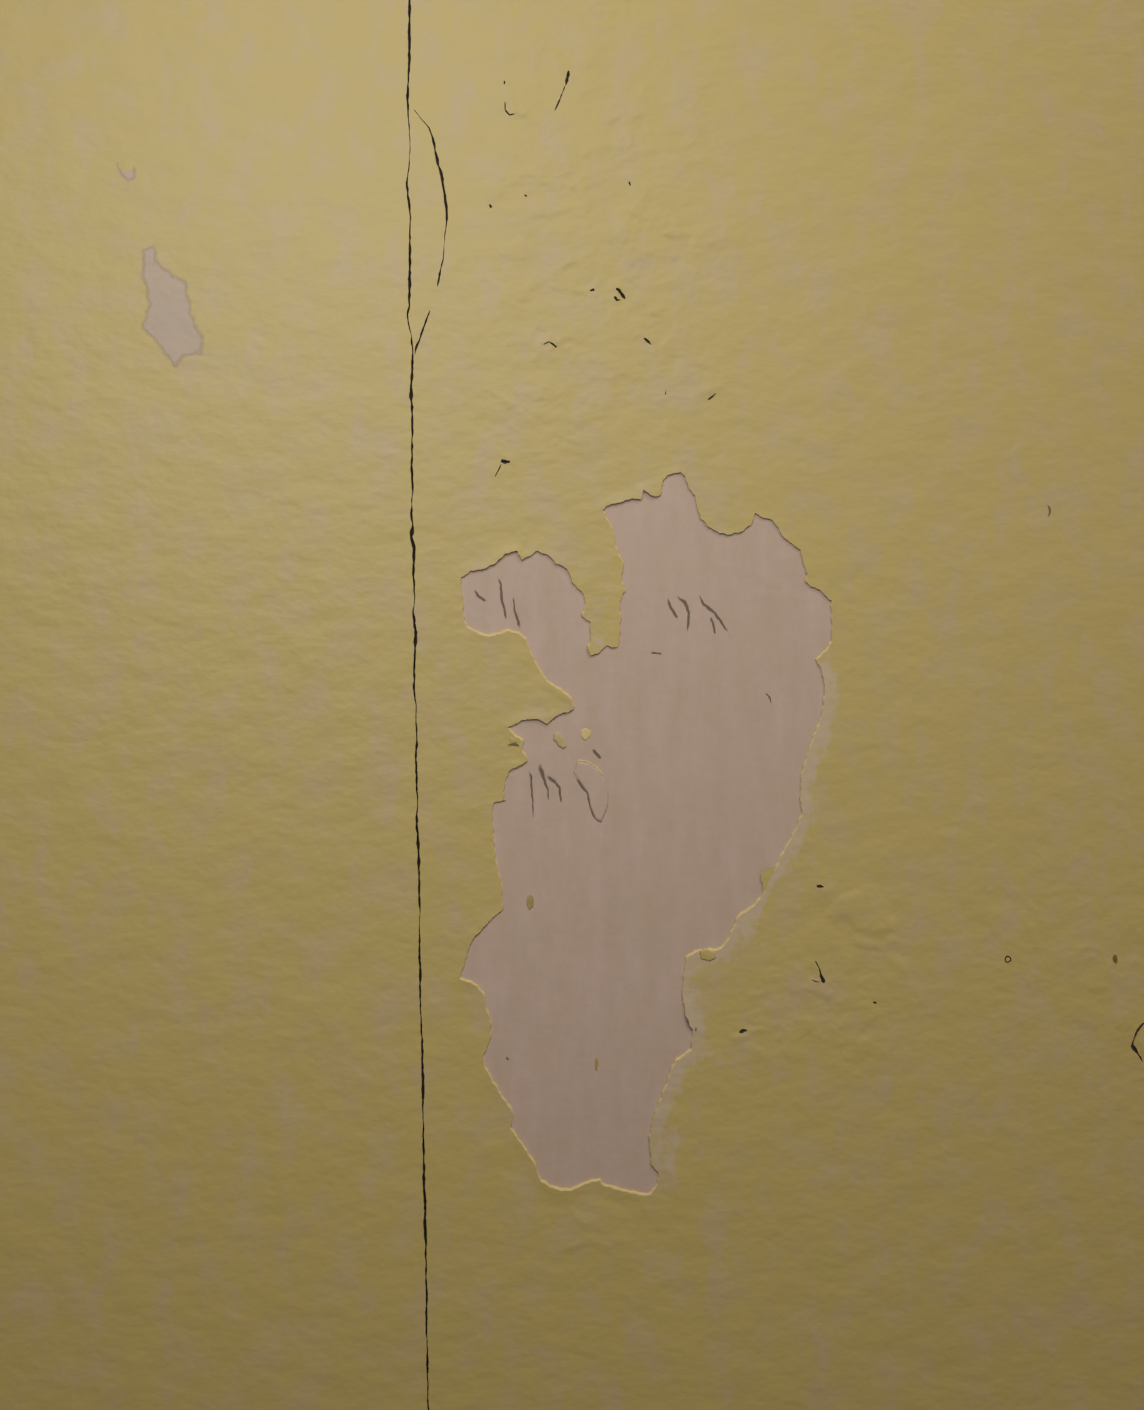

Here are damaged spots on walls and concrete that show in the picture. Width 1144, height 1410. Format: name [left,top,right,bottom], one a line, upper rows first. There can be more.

crack [406,0,448,1410]
peeling [459,472,833,1196]